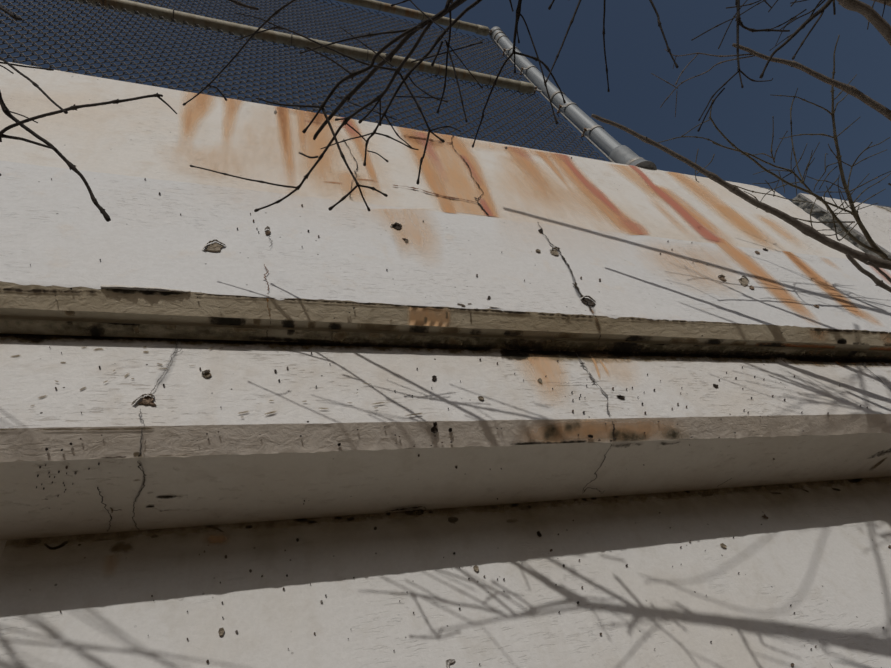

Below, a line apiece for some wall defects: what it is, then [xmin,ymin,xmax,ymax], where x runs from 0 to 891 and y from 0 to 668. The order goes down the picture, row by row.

corrosion [184,92,210,133]
corrosion [278,107,330,173]
corrosion [328,117,376,193]
crack [394,135,489,215]
corrosion [400,127,498,217]
corrosion [536,151,646,235]
corrosion [615,164,808,315]
corrosion [783,251,862,316]
leakage [0,307,891,383]
crack [538,222,615,493]
crack [97,340,182,532]